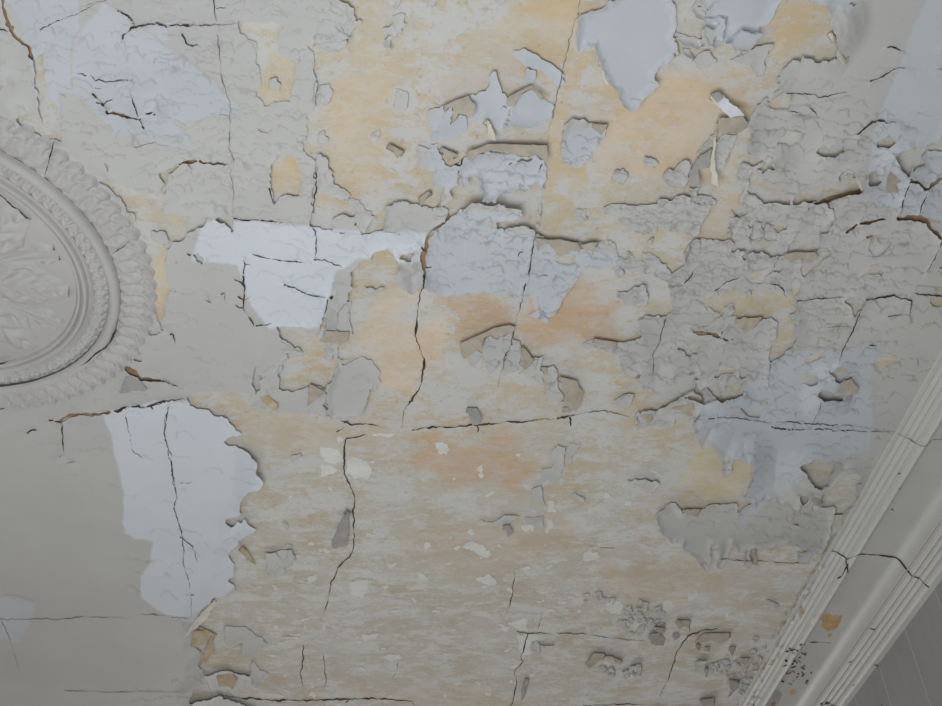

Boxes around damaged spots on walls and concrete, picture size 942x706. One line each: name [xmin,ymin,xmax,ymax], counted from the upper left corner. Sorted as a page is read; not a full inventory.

crack [27,366,197,620]
crack [0,0,280,224]
peeling [99,158,243,396]
crack [205,173,340,327]
damp [270,0,408,217]
damp [224,268,780,616]
crack [402,213,630,432]
peeling [178,0,901,706]
damp [417,0,760,249]
damp [756,0,836,72]
crack [846,178,942,269]
peeling [896,135,942,187]